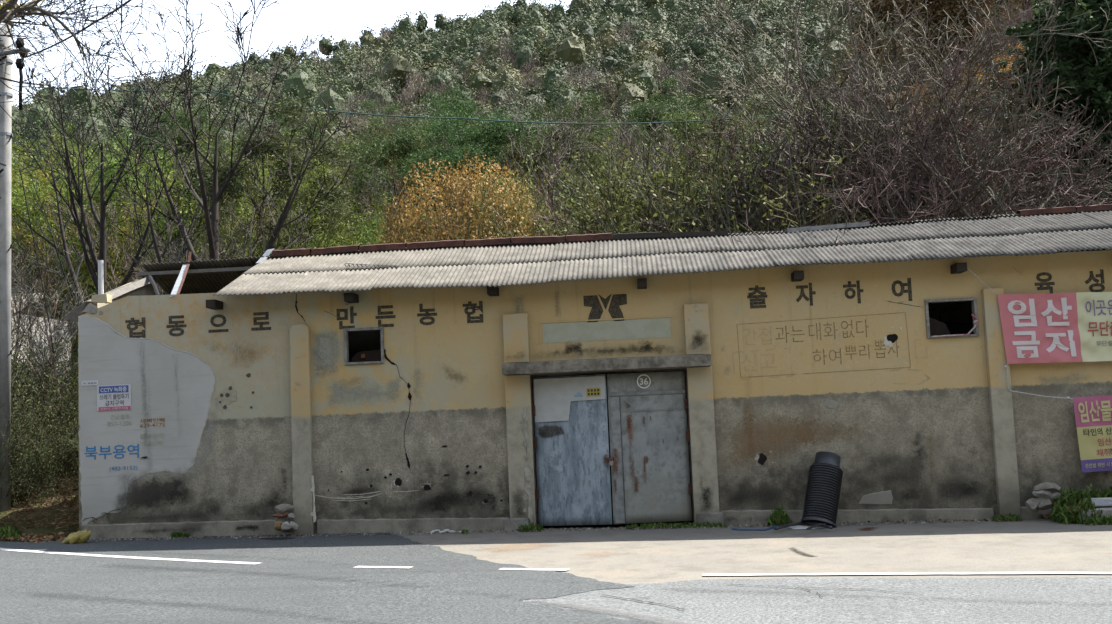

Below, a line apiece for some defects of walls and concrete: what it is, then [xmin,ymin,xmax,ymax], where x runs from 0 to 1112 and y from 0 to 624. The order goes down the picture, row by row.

crack [384,349,415,493]
water stain [121,478,218,532]